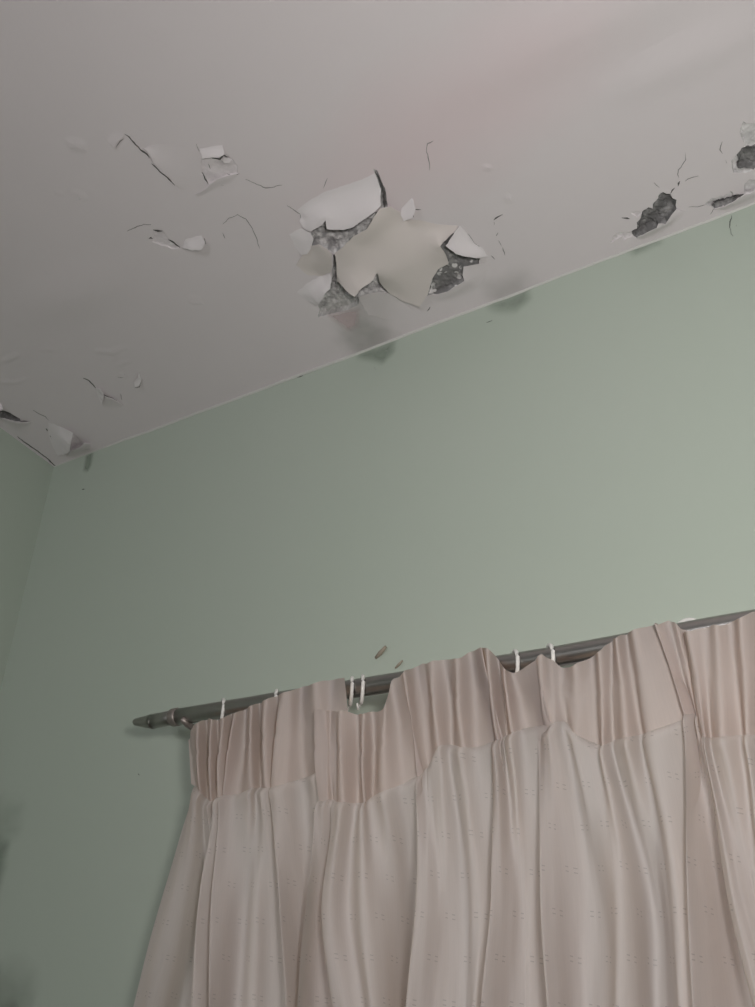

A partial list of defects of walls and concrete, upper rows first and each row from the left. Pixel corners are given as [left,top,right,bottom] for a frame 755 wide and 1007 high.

peeling [196,144,280,197]
spalling [610,121,755,244]
peeling [128,224,206,251]
peeling [288,169,495,331]
peeling [0,404,91,457]